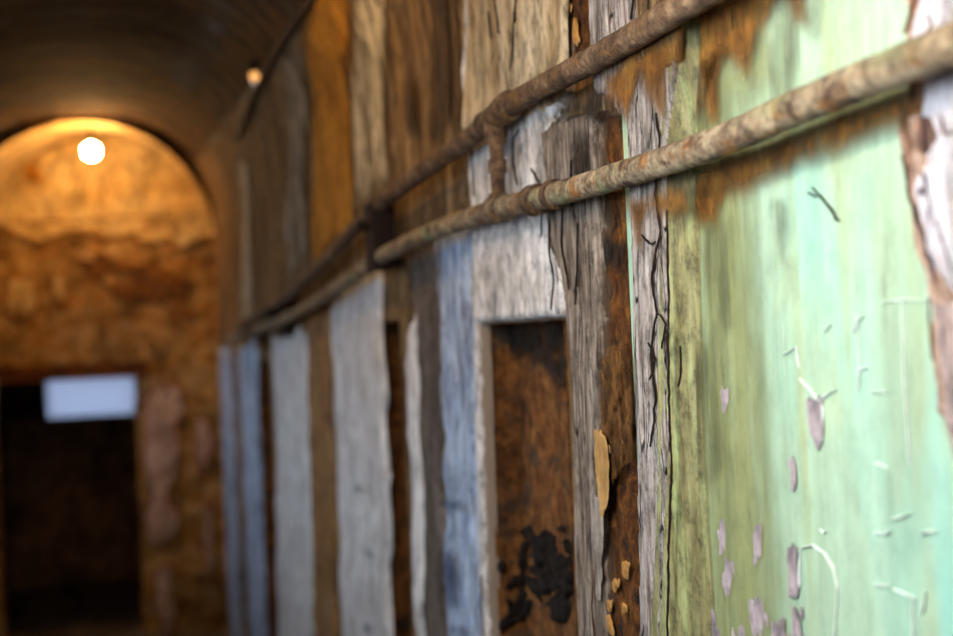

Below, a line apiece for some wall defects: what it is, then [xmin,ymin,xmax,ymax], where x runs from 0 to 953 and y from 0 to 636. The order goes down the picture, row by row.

corrosion [306,0,353,261]
spalling [606,115,624,164]
corrosion [607,41,677,114]
crack [654,113,662,148]
corrosion [697,0,778,119]
corrosion [630,94,924,239]
corrosion [790,0,804,20]
peeling [906,0,953,40]
peeling [897,68,953,451]
spalling [589,188,640,636]
crack [641,179,682,636]
peeling [699,189,803,636]